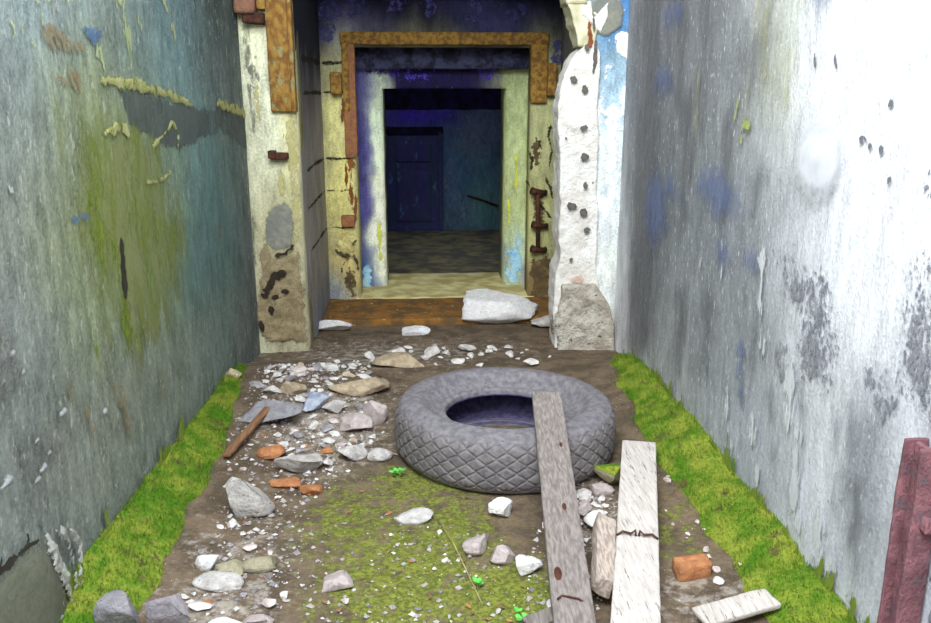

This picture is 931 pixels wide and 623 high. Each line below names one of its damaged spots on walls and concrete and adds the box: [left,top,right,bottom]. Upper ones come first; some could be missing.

flaking render [101,75,247,149]
corrosion [345,158,358,224]
spalling [386,0,628,367]
spalling [257,203,308,343]